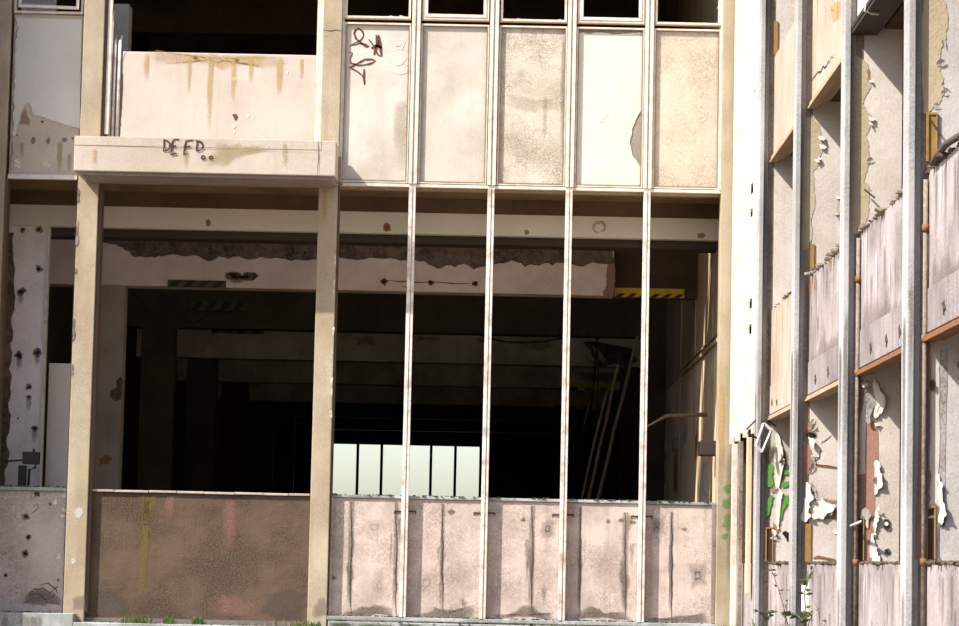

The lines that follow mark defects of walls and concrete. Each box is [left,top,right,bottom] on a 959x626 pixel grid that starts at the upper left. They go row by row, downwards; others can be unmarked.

peeling [921,0,948,114]
peeling [801,116,826,250]
peeling [833,54,876,234]
flaking render [103,240,317,261]
flaking render [334,245,615,297]
peeling [800,403,837,534]
peeling [850,379,885,564]
peeling [915,344,948,561]
damp [345,503,397,616]
damp [502,507,547,618]
damp [579,509,626,619]
damp [655,514,703,622]